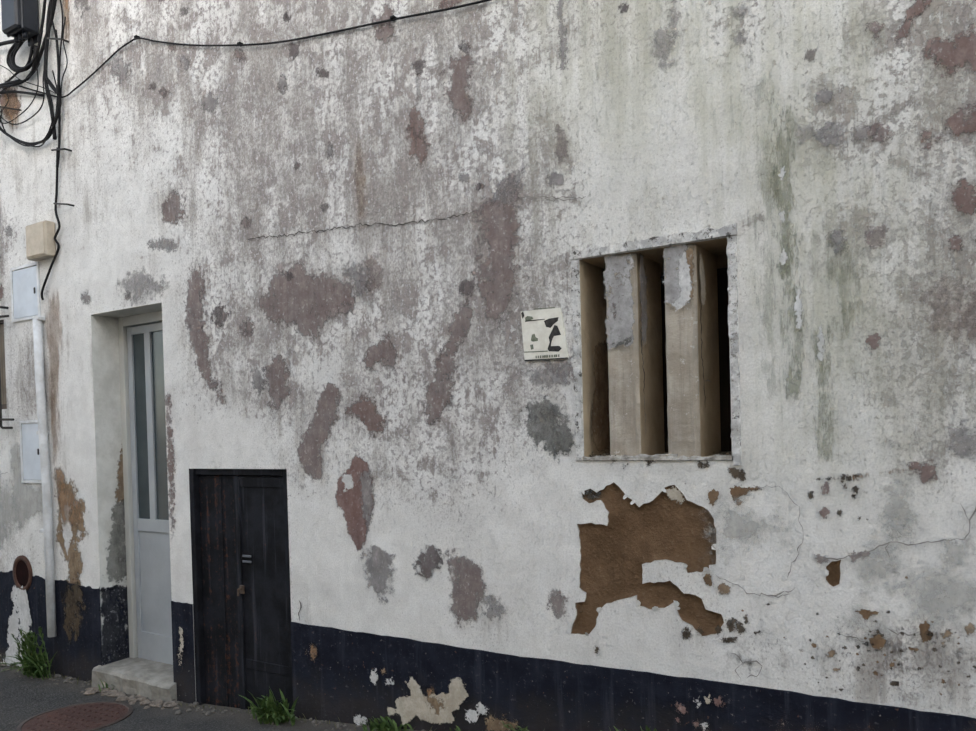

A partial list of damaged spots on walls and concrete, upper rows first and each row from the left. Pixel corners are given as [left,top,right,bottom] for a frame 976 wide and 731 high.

peeling [612,253,648,347]
peeling [671,247,707,311]
water stain [519,395,576,460]
peeling [54,468,86,586]
flaking render [547,467,762,636]
crack [716,485,976,598]
spalling [869,634,887,650]
spalling [919,620,953,646]
peeling [370,668,518,731]